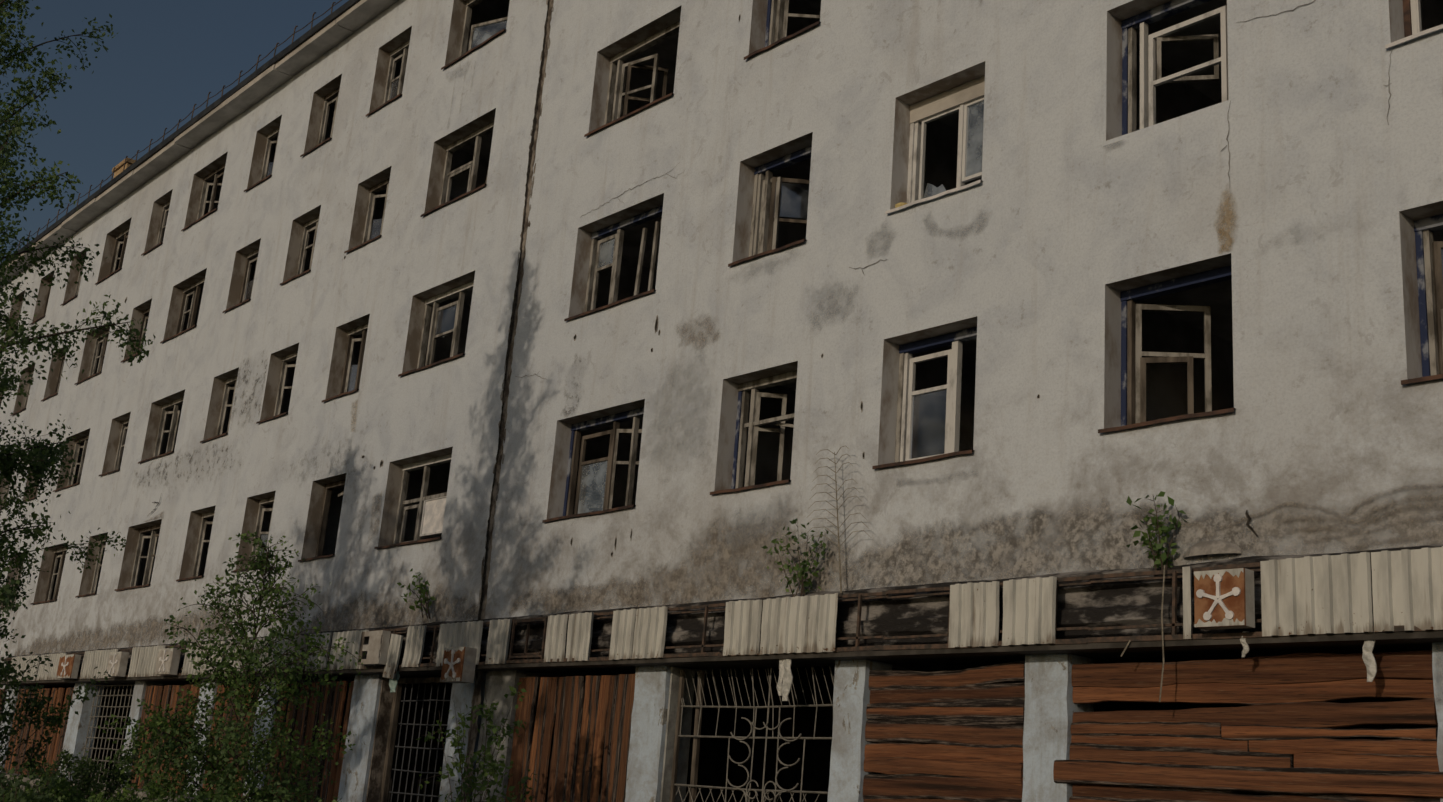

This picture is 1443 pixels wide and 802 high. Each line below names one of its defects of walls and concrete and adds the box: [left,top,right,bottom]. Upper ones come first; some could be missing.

crack [1236,0,1315,23]
crack [580,163,679,218]
leakage [1241,490,1443,556]
leakage [15,604,230,656]
leakage [300,586,479,634]